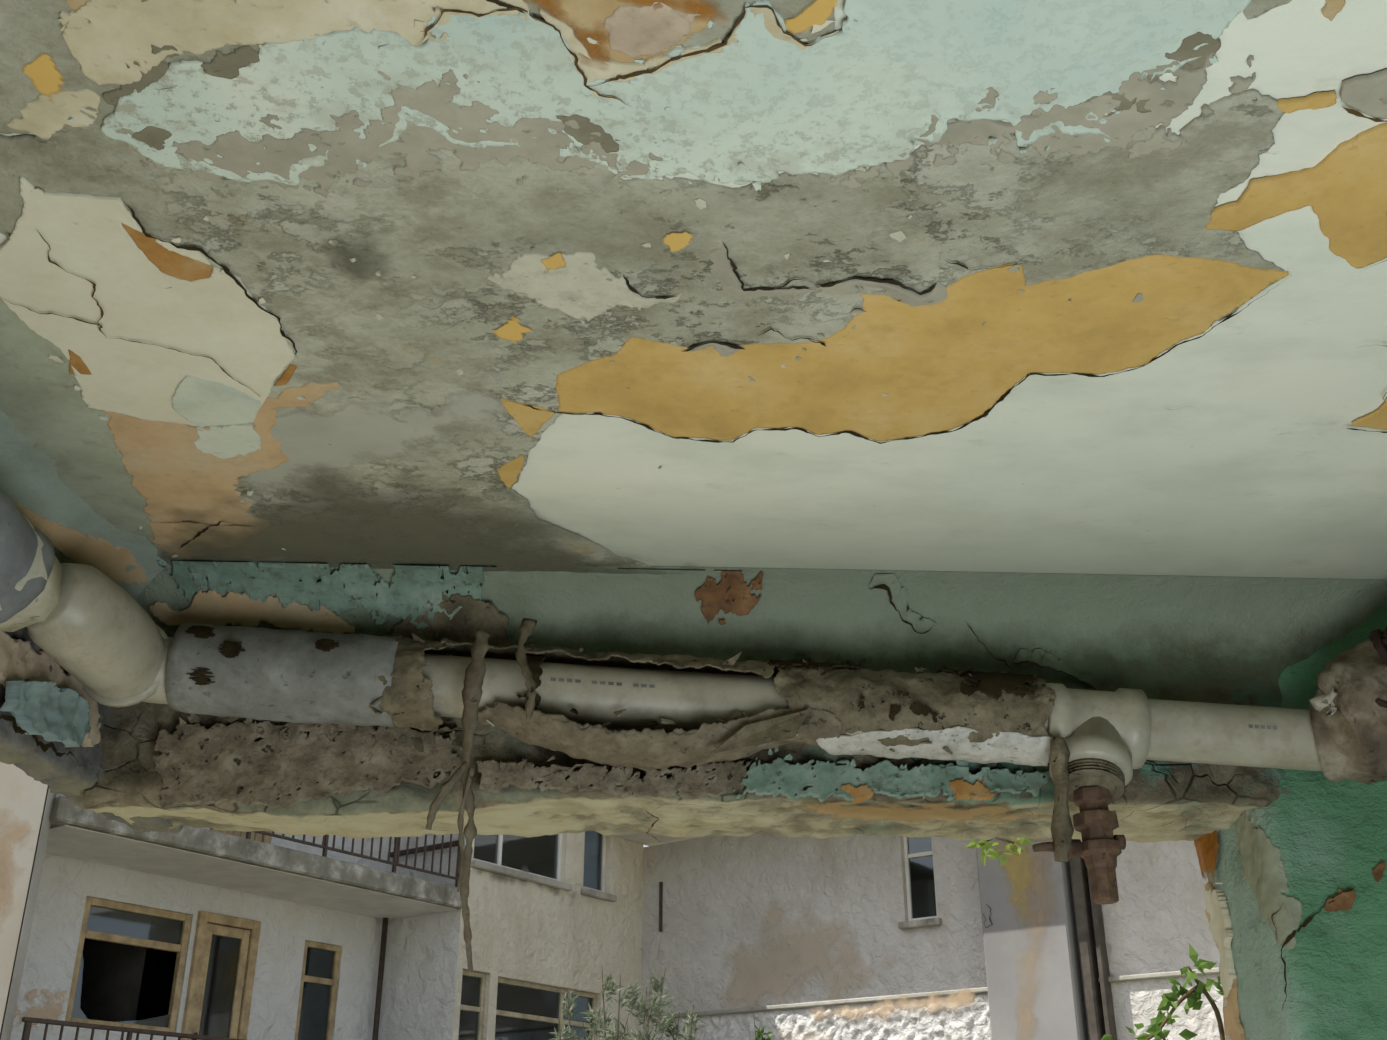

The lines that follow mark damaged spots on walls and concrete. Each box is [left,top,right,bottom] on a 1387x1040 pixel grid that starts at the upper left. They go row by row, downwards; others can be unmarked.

crack [616,274,682,308]
spalling [0,0,1387,656]
crack [681,241,1023,357]
spalling [0,631,101,747]
spalling [152,714,1050,825]
peeling [1233,810,1303,949]
peeling [1204,882,1246,1040]